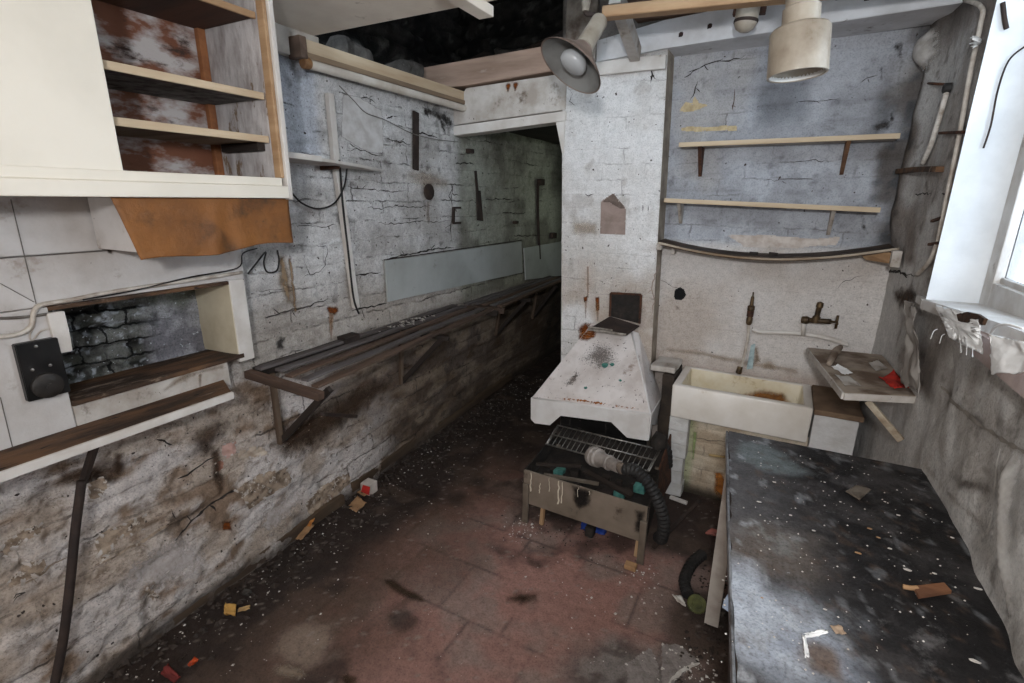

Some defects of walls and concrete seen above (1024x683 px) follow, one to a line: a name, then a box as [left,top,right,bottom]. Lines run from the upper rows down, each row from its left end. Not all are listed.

crack [684,58,741,100]
crack [348,96,439,156]
mould [424,108,453,132]
crack [263,222,335,318]
rust [579,323,596,340]
water stain [280,382,386,453]
water stain [62,454,124,483]
water stain [195,423,223,492]
crack [96,489,237,565]